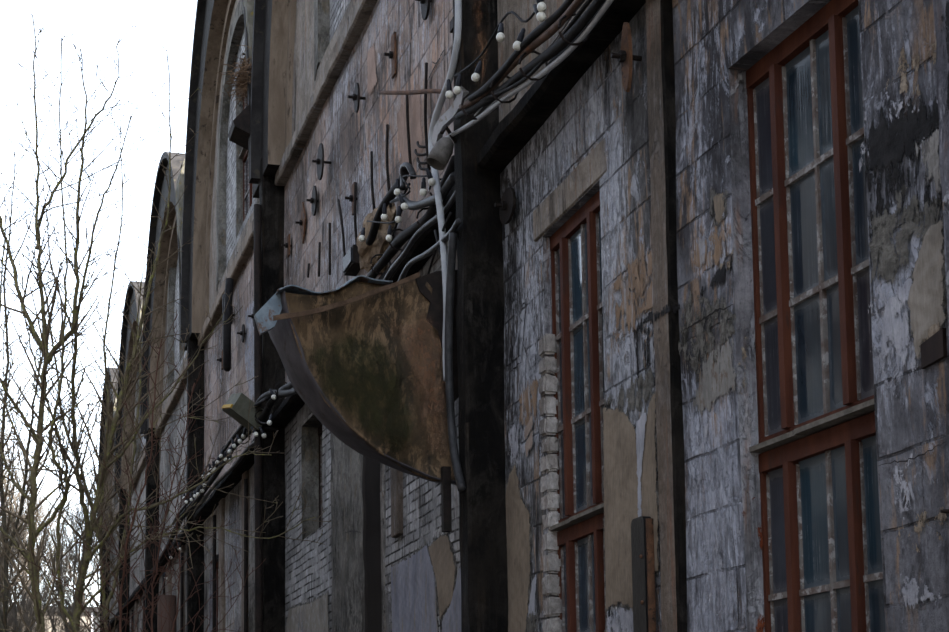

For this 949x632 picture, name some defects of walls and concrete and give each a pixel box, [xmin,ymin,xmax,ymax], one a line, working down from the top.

spalling [883,38,937,123]
peeling [693,187,734,272]
spalling [868,129,949,397]
peeling [603,228,656,423]
spalling [678,290,749,395]
peeling [894,453,949,553]
peeling [390,532,461,632]
peeling [520,496,541,632]
peeling [604,602,633,632]